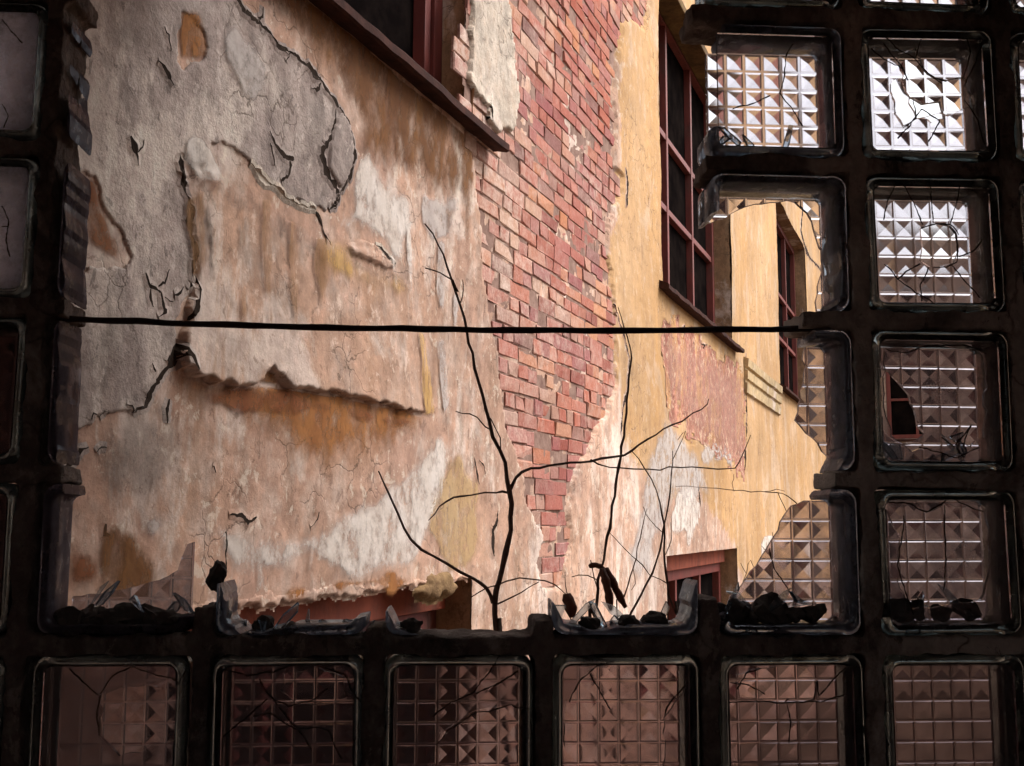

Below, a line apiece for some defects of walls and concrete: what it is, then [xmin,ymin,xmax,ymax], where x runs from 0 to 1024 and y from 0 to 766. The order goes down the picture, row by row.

crack [64,153,204,468]
flaking render [71,0,354,430]
flaking render [347,239,395,270]
flaking render [450,0,647,587]
crack [872,36,985,144]
crack [883,184,983,304]
spalling [238,456,478,614]
spalling [631,314,747,574]